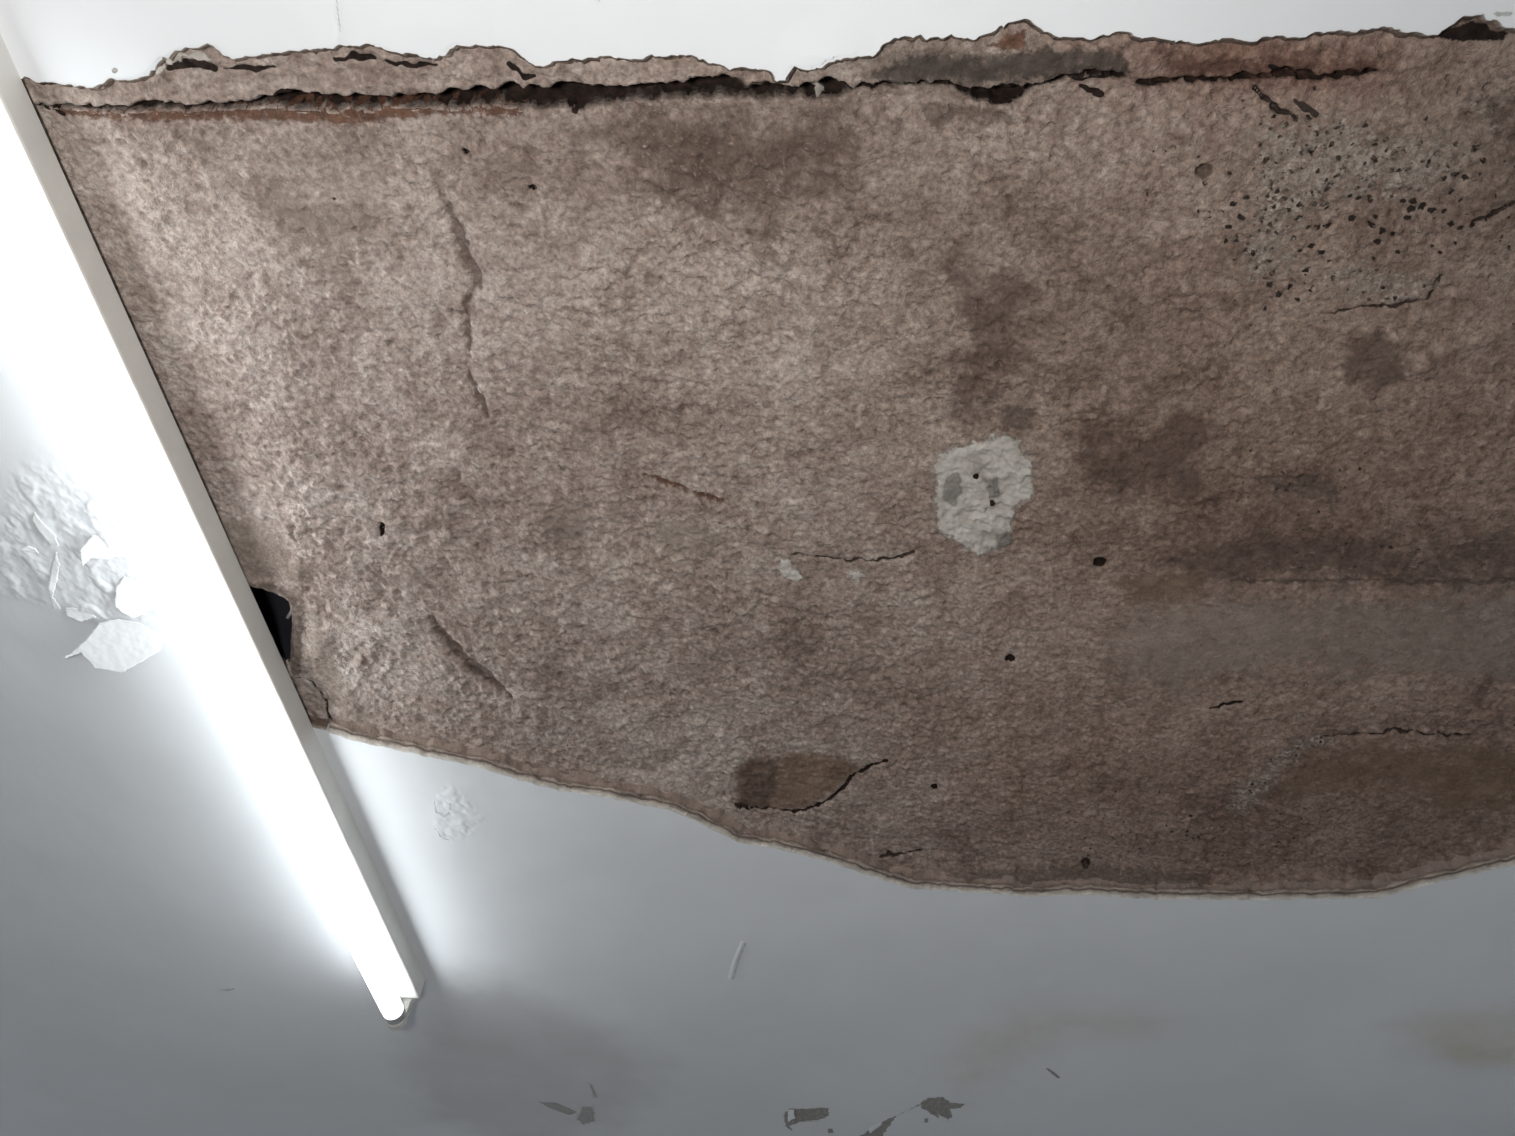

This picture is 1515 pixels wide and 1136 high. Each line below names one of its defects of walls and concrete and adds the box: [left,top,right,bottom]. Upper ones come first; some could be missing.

crack [37,0,1376,118]
crack [1471,200,1515,223]
crack [1333,274,1441,314]
flaking render [21,14,1515,901]
crack [735,759,888,813]
peeling [543,1085,596,1124]
peeling [784,1108,834,1133]
peeling [860,1097,964,1136]